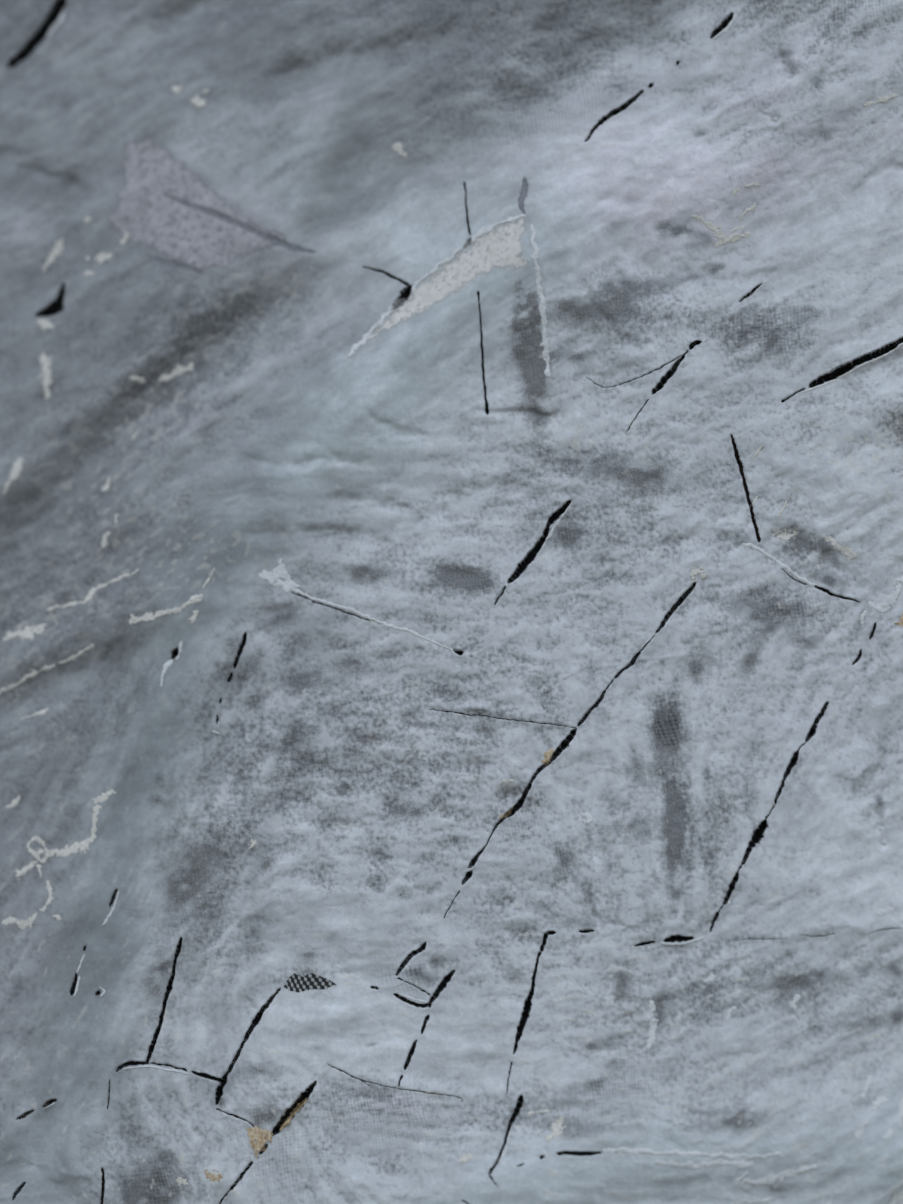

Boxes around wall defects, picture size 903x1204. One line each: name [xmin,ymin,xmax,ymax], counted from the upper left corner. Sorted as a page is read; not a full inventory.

crack [7,0,66,68]
crack [585,83,654,142]
peeling [348,176,551,377]
crack [586,338,707,432]
crack [781,338,903,402]
crack [495,500,573,604]
crack [731,434,876,665]
crack [212,633,247,734]
crack [429,583,696,918]
crack [631,702,831,949]
crack [107,937,462,1204]
crack [488,930,602,1187]